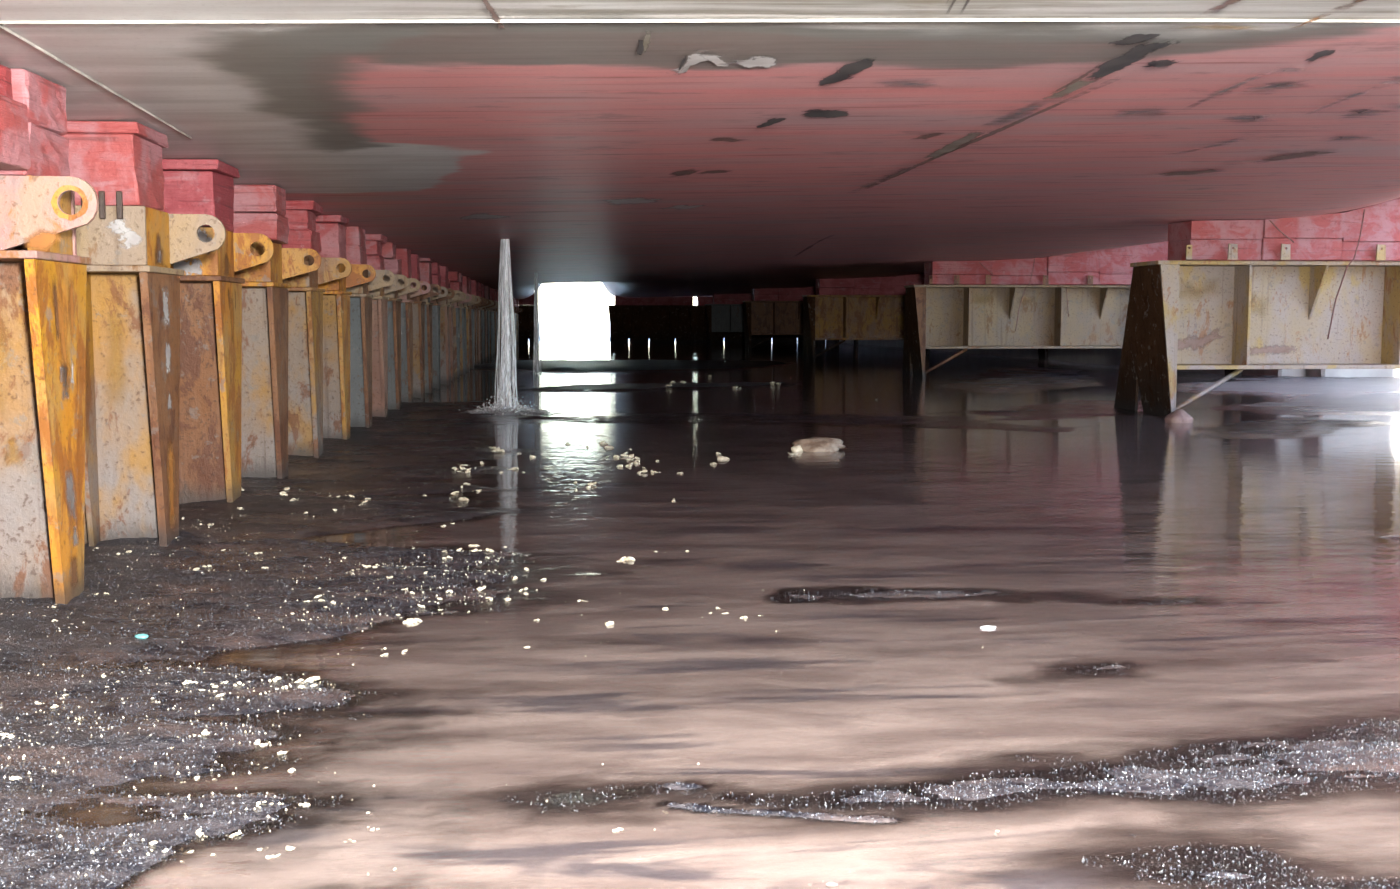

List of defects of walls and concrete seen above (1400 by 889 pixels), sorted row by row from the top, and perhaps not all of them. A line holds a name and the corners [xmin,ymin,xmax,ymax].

peeling [673,52,776,73]
spalling [819,58,874,85]
rust [54,282,74,386]
rust [167,448,175,520]